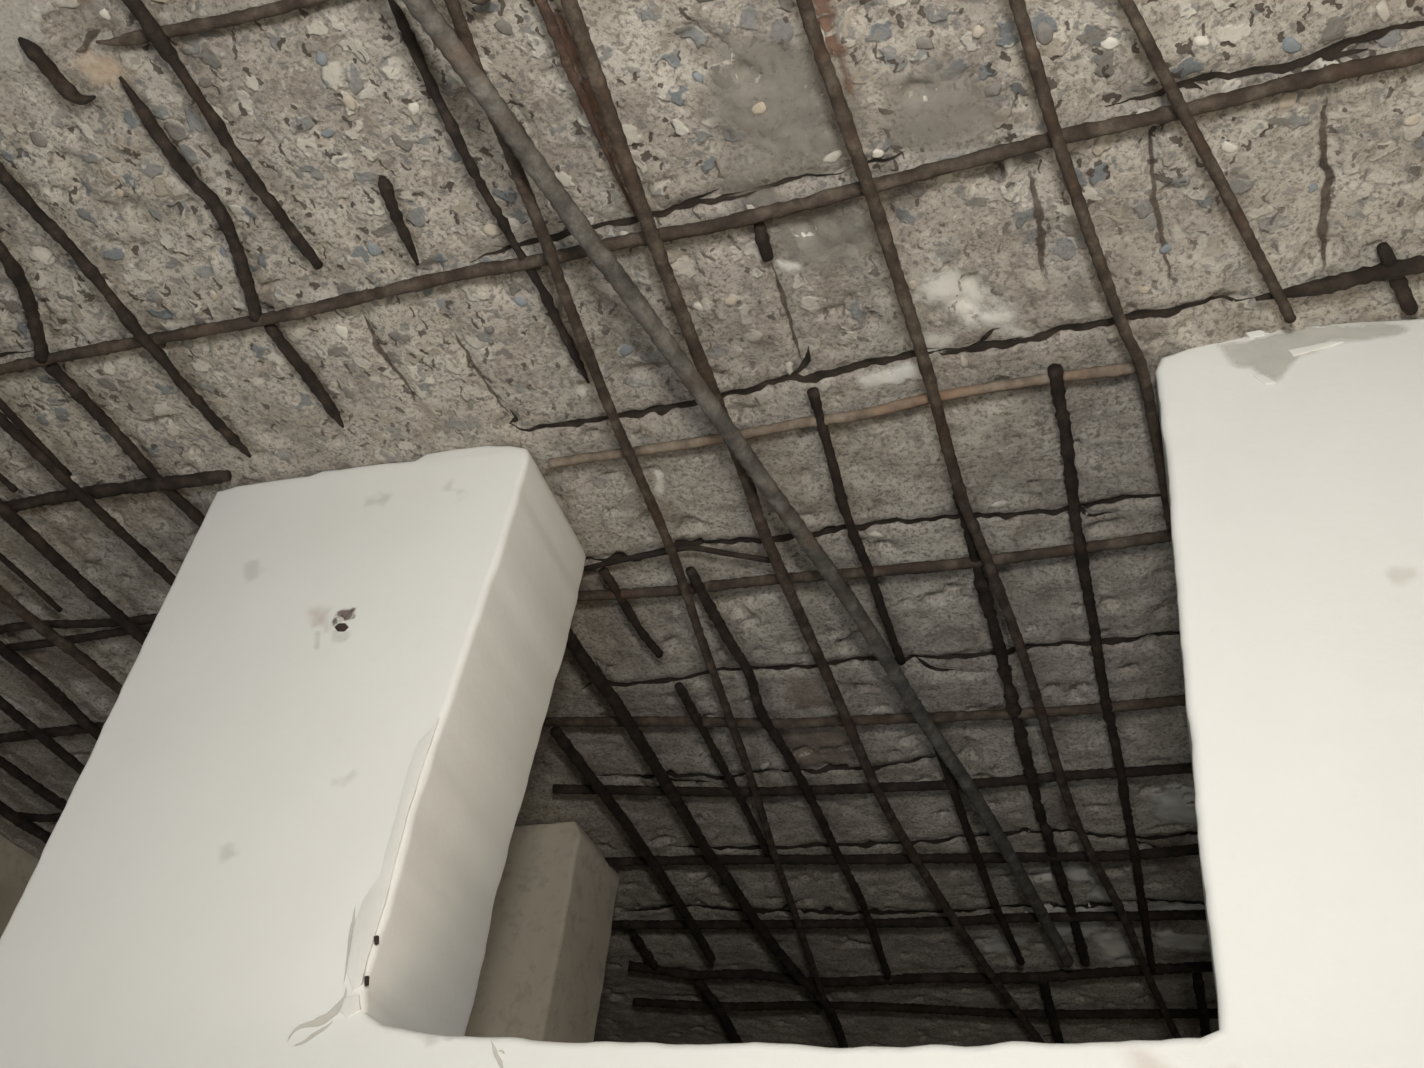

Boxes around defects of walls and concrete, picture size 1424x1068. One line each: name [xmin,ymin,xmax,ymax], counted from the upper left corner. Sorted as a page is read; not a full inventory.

rust [78,50,122,83]
rust [812,0,852,93]
crack [509,295,1255,432]
spalling [0,0,1074,1048]
crack [585,494,1161,562]
spalling [548,0,1424,1044]
crack [583,631,1180,689]
crack [670,824,1198,850]
crack [630,898,1205,917]